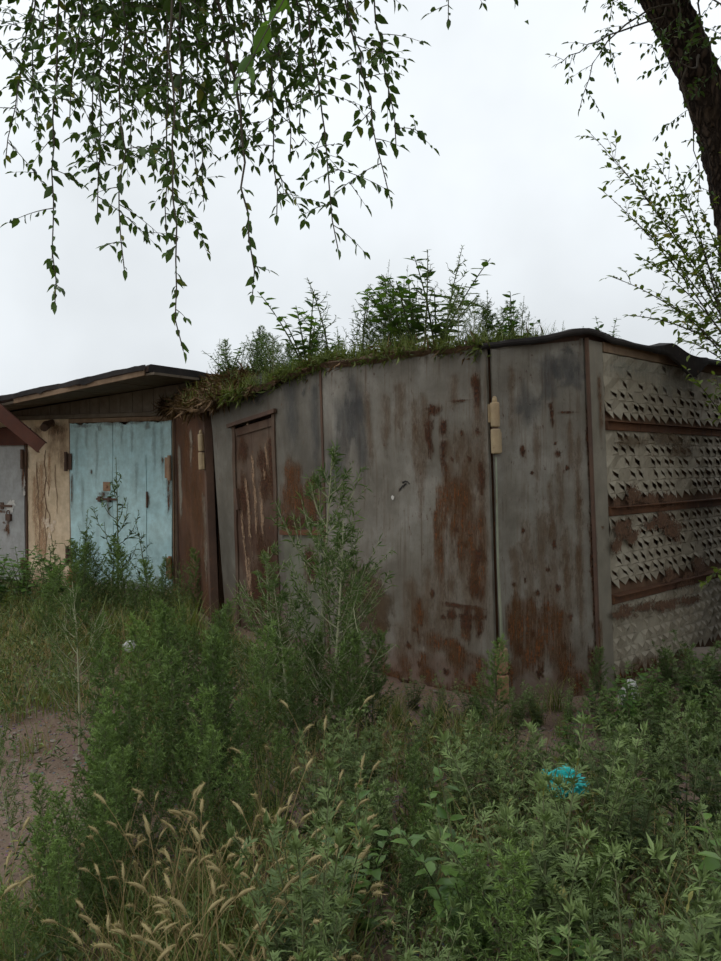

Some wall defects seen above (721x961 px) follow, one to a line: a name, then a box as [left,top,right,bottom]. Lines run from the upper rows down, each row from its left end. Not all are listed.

rust [453,373,480,408]
rust [236,437,323,530]
rust [375,404,498,700]
rust [506,483,687,696]
rust [611,594,701,620]